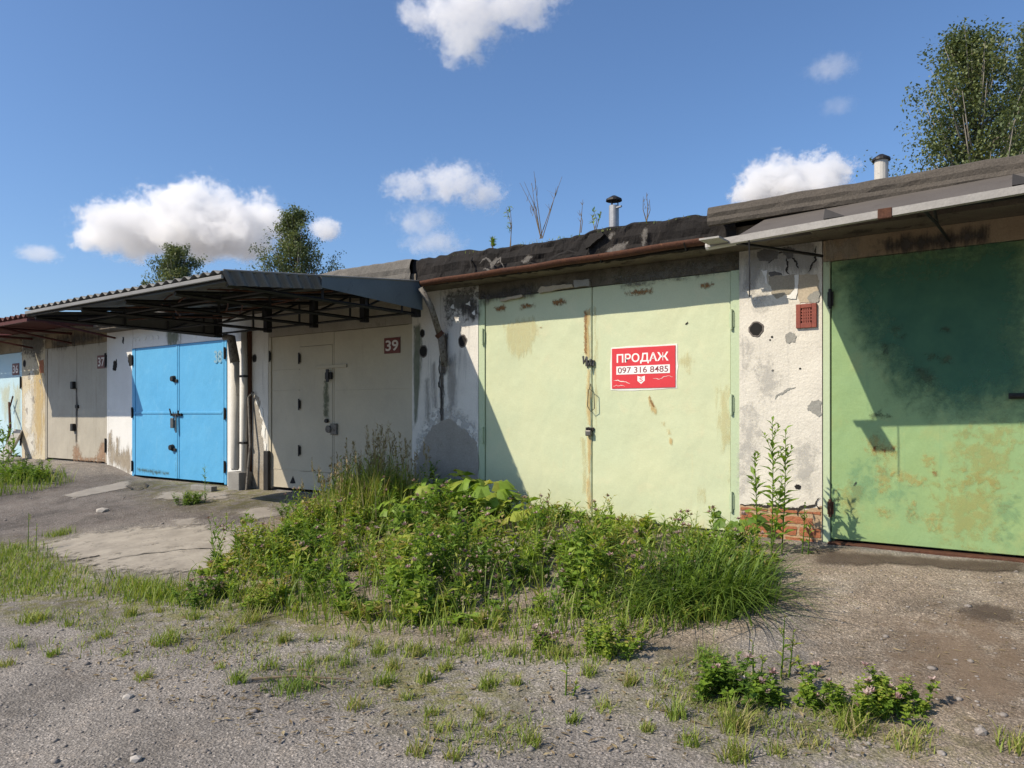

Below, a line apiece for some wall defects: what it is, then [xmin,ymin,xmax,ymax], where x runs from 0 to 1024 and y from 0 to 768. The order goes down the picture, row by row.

damp [885,227,989,254]
spalling [748,244,817,304]
peeling [443,286,480,326]
spalling [739,505,822,542]